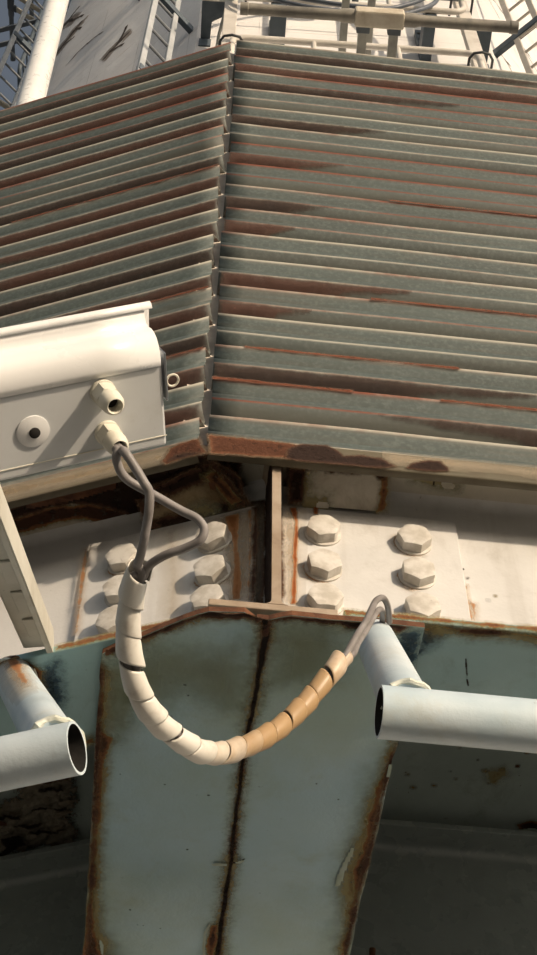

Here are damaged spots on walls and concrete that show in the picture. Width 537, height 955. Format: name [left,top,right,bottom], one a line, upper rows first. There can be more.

rust [0,49,537,189]
rust [0,152,336,292]
rust [0,250,214,317]
rust [149,305,208,331]
rust [159,334,209,358]
rust [41,272,537,321]
rust [168,363,537,411]
rust [10,434,449,604]
rust [141,602,537,647]
rust [0,655,45,687]
rust [56,550,116,955]
rust [0,777,80,857]